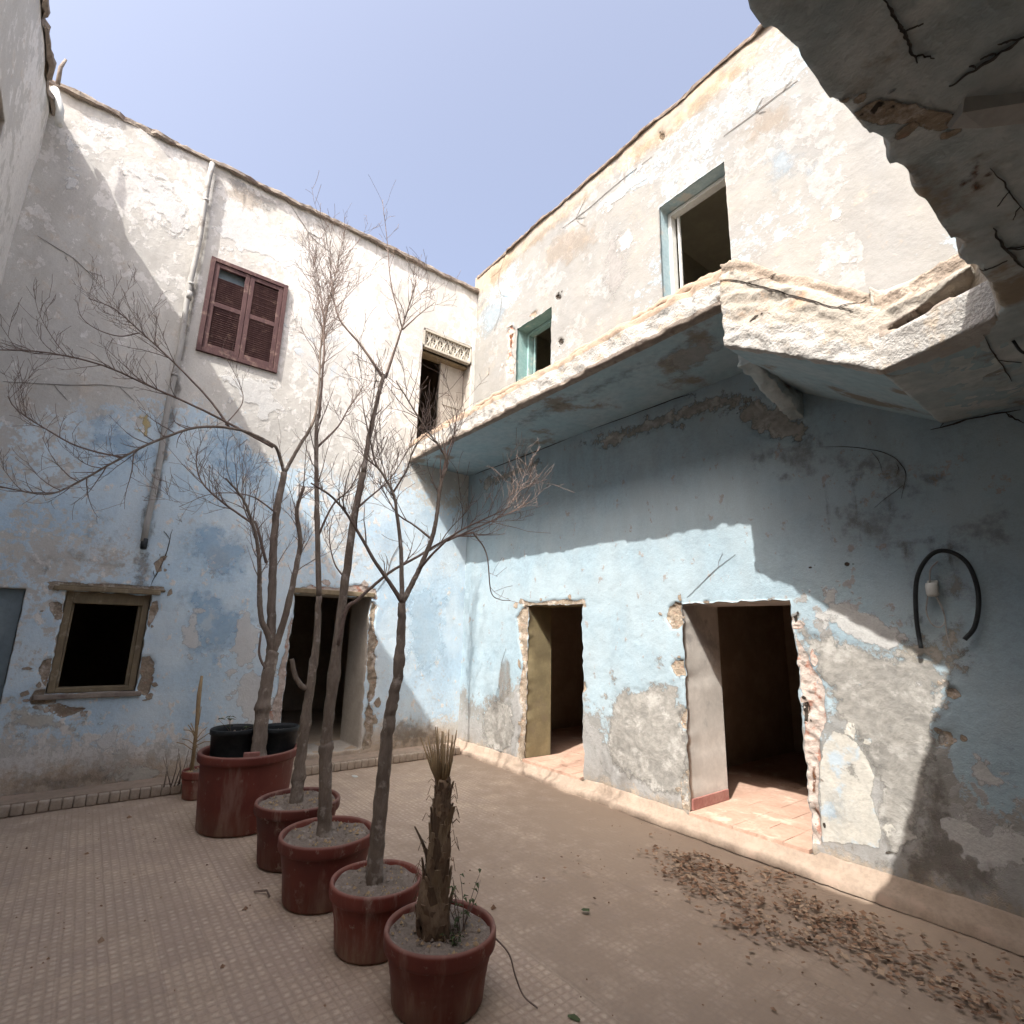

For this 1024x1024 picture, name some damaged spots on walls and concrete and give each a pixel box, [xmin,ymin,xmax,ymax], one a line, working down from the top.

crack [883,0,935,63]
crack [949,36,1024,87]
spalling [836,89,962,140]
crack [979,168,1024,272]
crack [709,273,865,310]
spalling [40,581,172,628]
peeling [5,658,88,736]
spalling [138,656,158,701]
spalling [301,580,381,750]
peeling [482,594,586,761]
peeling [604,656,690,811]
peeling [792,589,1024,880]